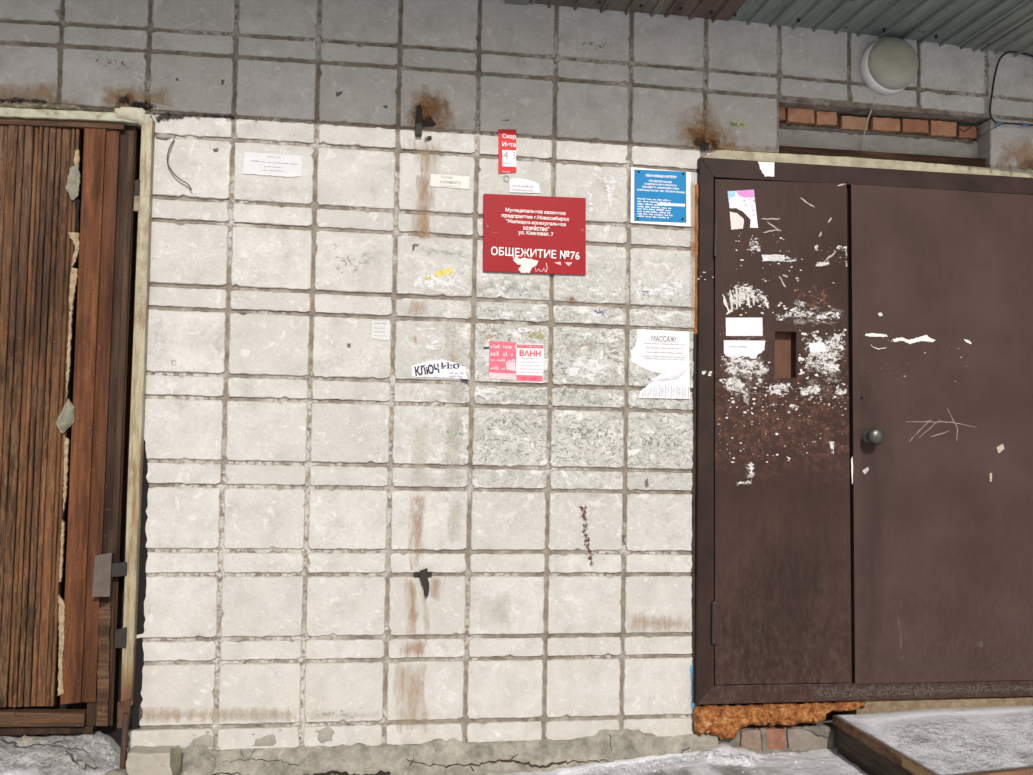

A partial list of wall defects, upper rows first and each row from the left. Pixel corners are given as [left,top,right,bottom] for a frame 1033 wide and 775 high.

rust [0,86,58,103]
rust [105,89,235,122]
rust [413,93,448,167]
rust [685,111,751,152]
rust [996,143,1033,170]
crack [212,734,612,775]